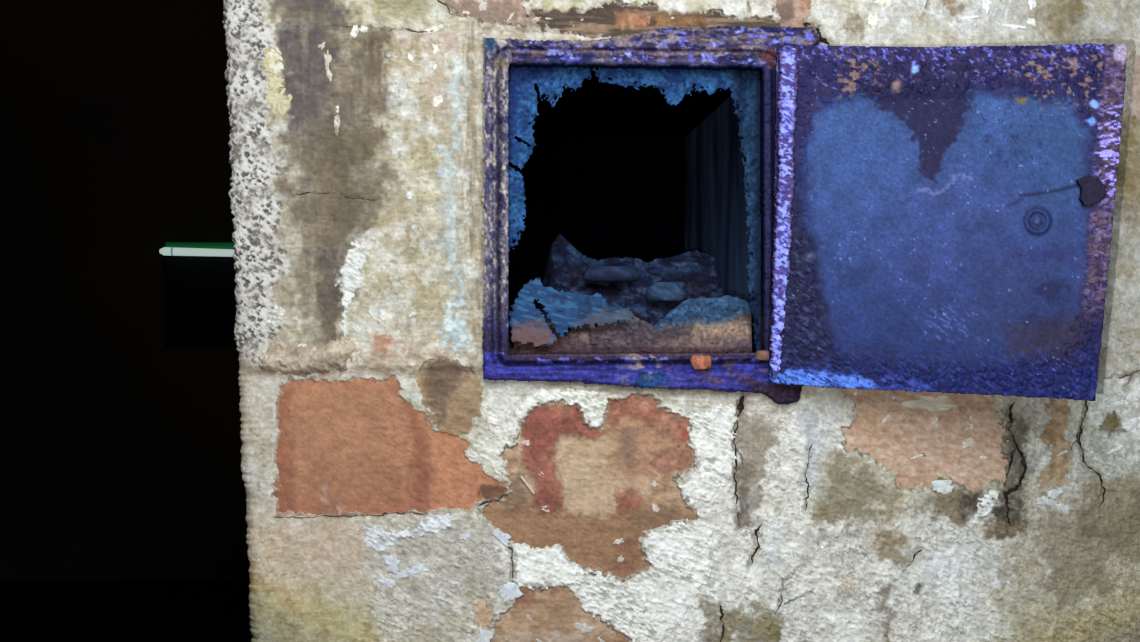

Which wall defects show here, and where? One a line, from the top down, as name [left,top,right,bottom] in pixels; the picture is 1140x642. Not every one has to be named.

spalling [439,0,816,38]
damp [272,0,397,344]
spalling [274,357,739,642]
crack [733,395,762,565]
spalling [841,388,1009,523]
crack [1003,403,1028,526]
crack [1071,400,1106,508]